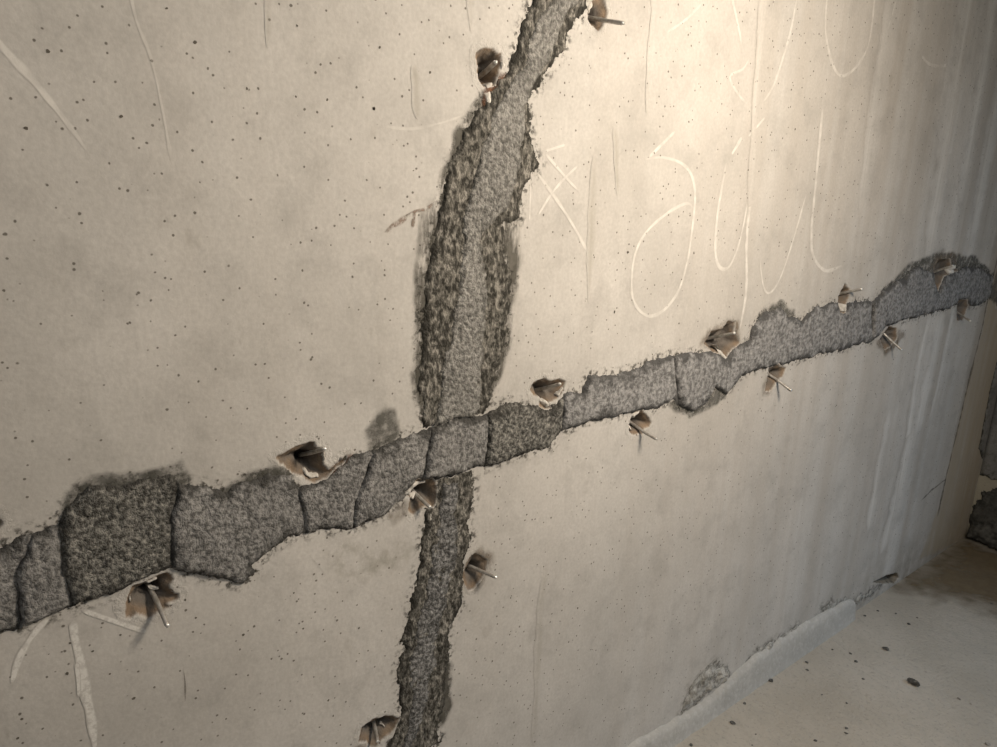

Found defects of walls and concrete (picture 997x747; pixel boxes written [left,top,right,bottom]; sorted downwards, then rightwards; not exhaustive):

crack [413,0,587,428]
leakage [923,0,997,269]
crack [0,254,997,747]
leakage [905,262,997,603]